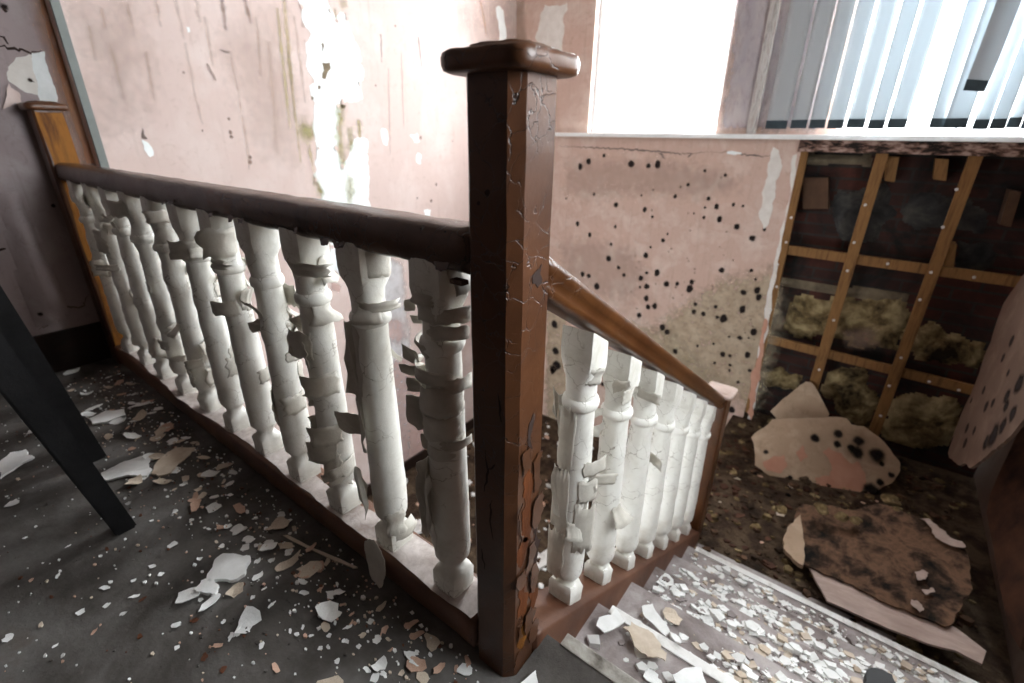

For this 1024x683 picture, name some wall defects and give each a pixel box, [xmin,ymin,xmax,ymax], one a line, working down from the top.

peeling [7,51,58,102]
peeling [298,0,371,207]
leakage [688,196,740,232]
leakage [606,233,779,413]
spalling [747,147,797,420]
leakage [951,335,1024,449]
leakage [834,430,895,495]